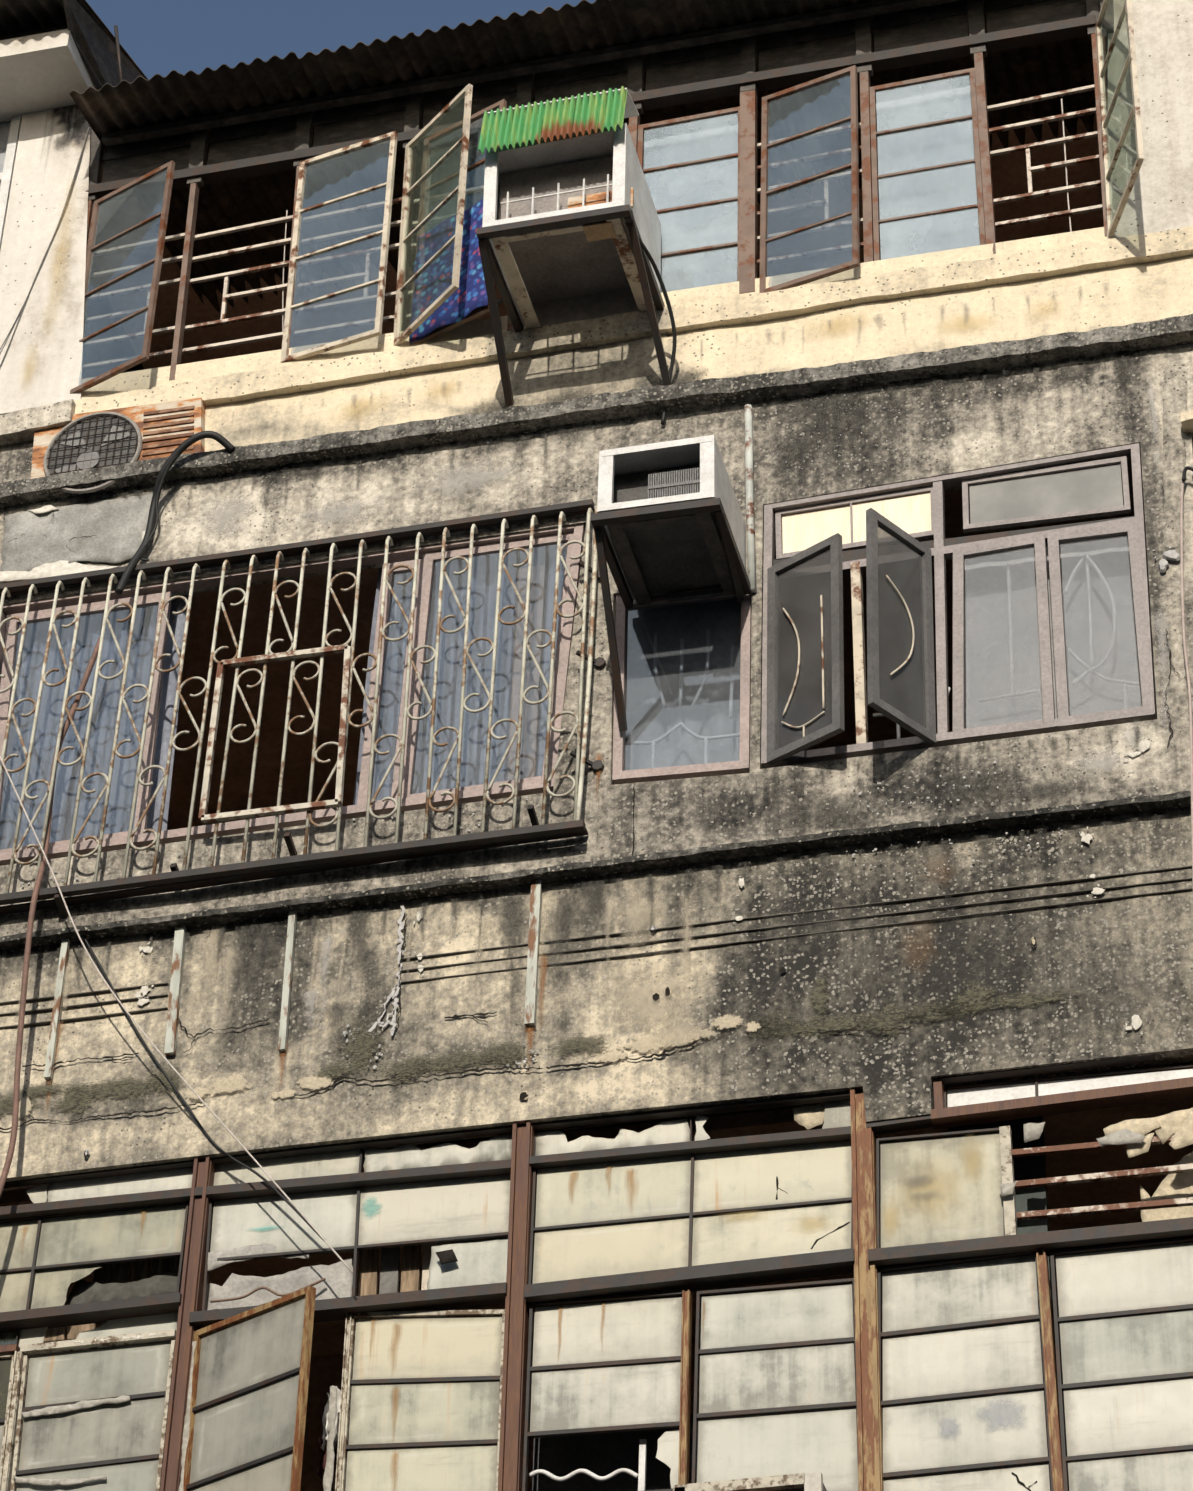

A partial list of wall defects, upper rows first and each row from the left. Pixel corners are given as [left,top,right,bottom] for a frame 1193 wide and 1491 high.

water stain [543,874,619,976]
water stain [58,946,83,997]
water stain [748,975,1084,1038]
flaking render [18,1097,31,1119]
water stain [0,1067,185,1117]
flaking render [188,1072,250,1099]
flaking render [270,1022,384,1099]
water stain [305,991,609,1084]
flaking render [593,1014,761,1062]